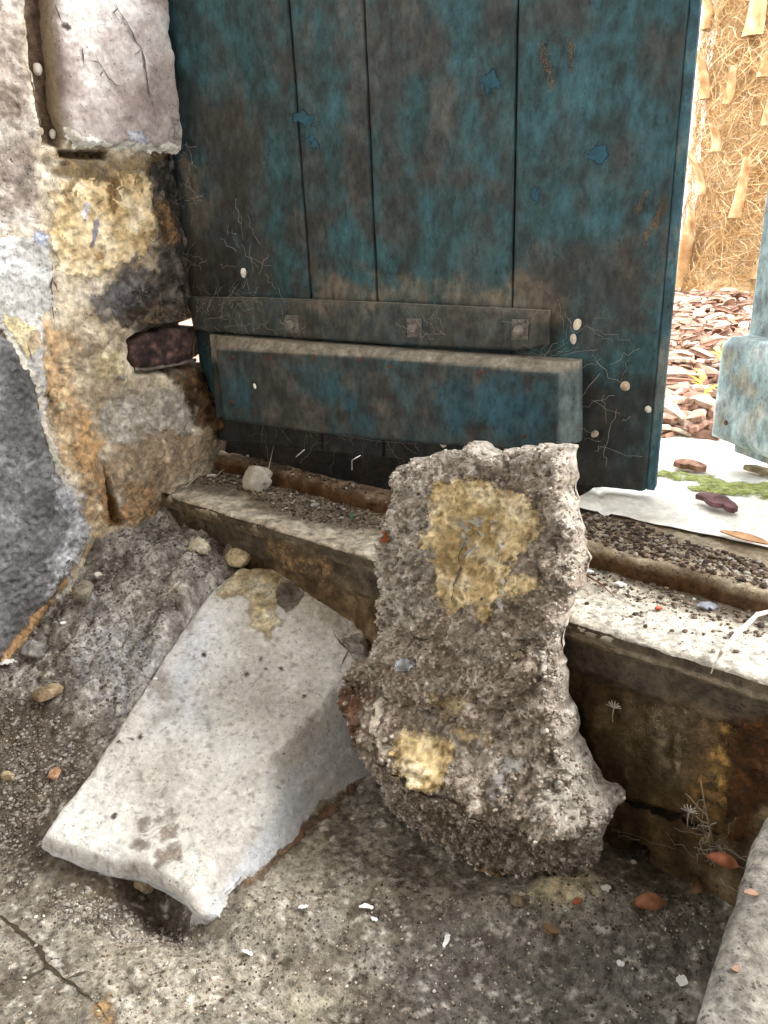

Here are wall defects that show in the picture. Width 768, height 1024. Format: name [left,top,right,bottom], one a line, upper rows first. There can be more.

crack [82,3,159,125]
leakage [46,151,192,336]
flaking render [0,169,159,663]
crack [625,799,720,835]
corrosion [685,716,768,845]
crack [0,915,108,1020]